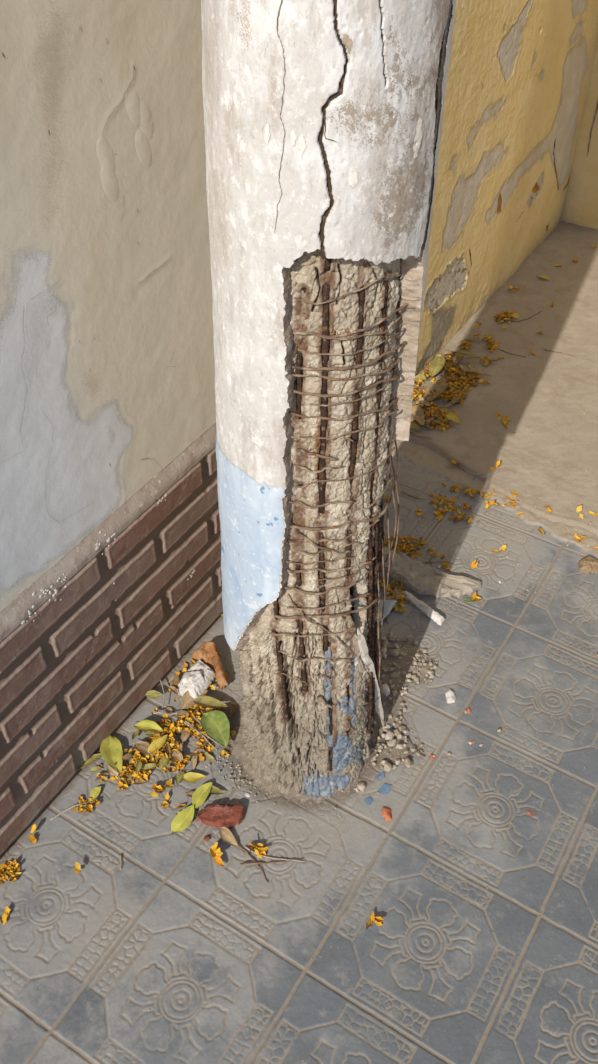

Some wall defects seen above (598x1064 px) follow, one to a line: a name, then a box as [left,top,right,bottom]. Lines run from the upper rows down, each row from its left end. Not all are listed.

crack [275,0,285,228]
crack [317,0,348,259]
crack [378,0,386,85]
crack [420,0,453,256]
spalling [234,0,589,800]